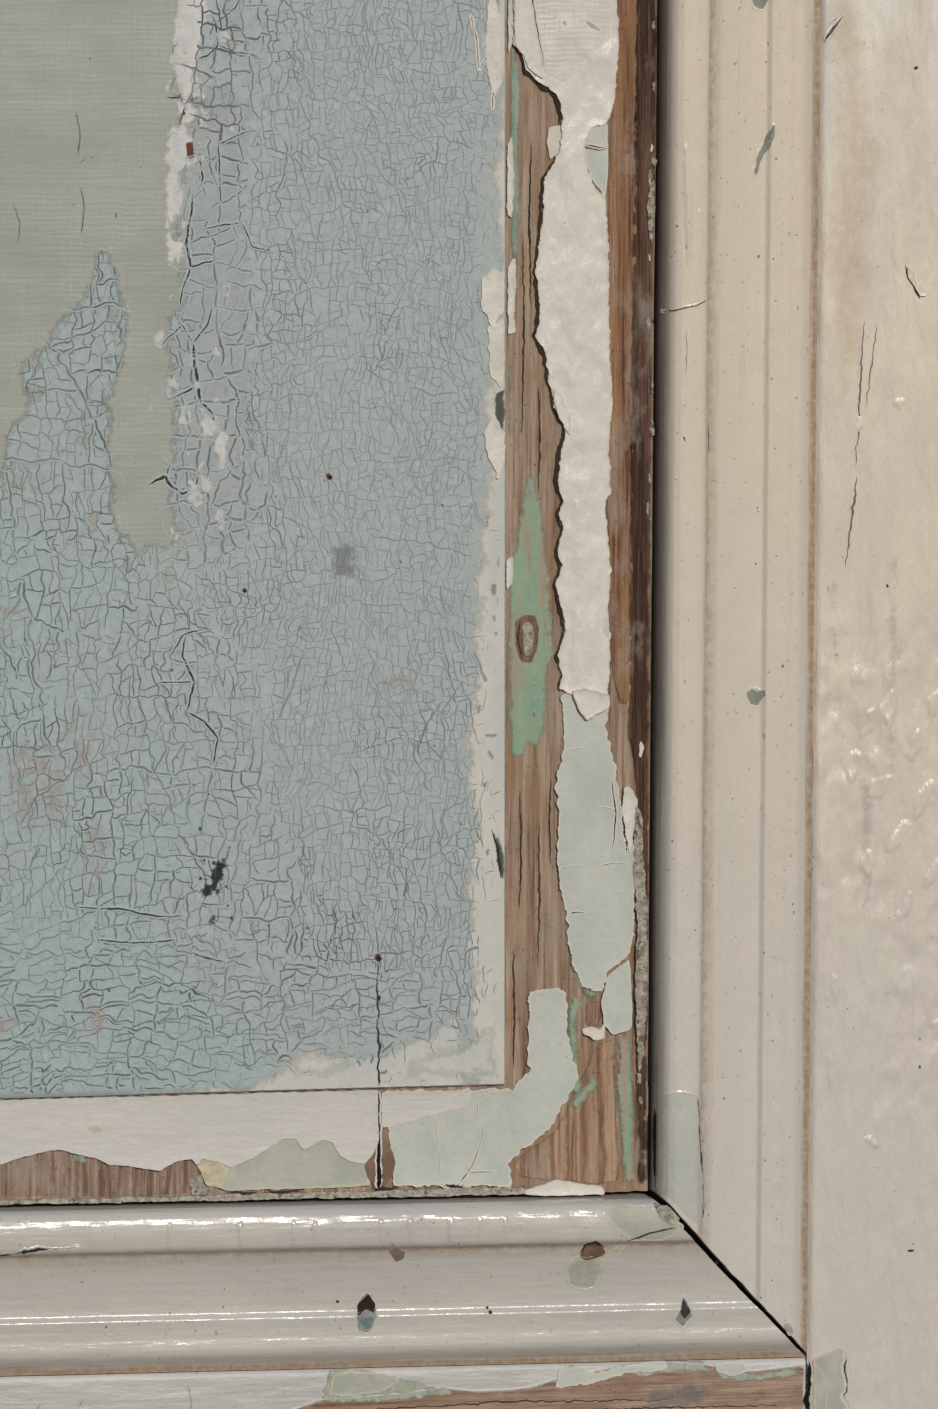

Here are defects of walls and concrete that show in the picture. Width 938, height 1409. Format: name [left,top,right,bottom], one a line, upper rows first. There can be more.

crack [469,0,496,110]
crack [168,97,205,124]
crack [76,114,85,232]
crack [160,129,268,434]
crack [148,460,200,497]
crack [157,628,220,764]
peeling [0,0,706,1291]
crack [76,905,227,964]
crack [374,965,383,1188]
peeling [353,1291,379,1335]
peeling [323,1369,452,1403]
peeling [556,1348,853,1409]